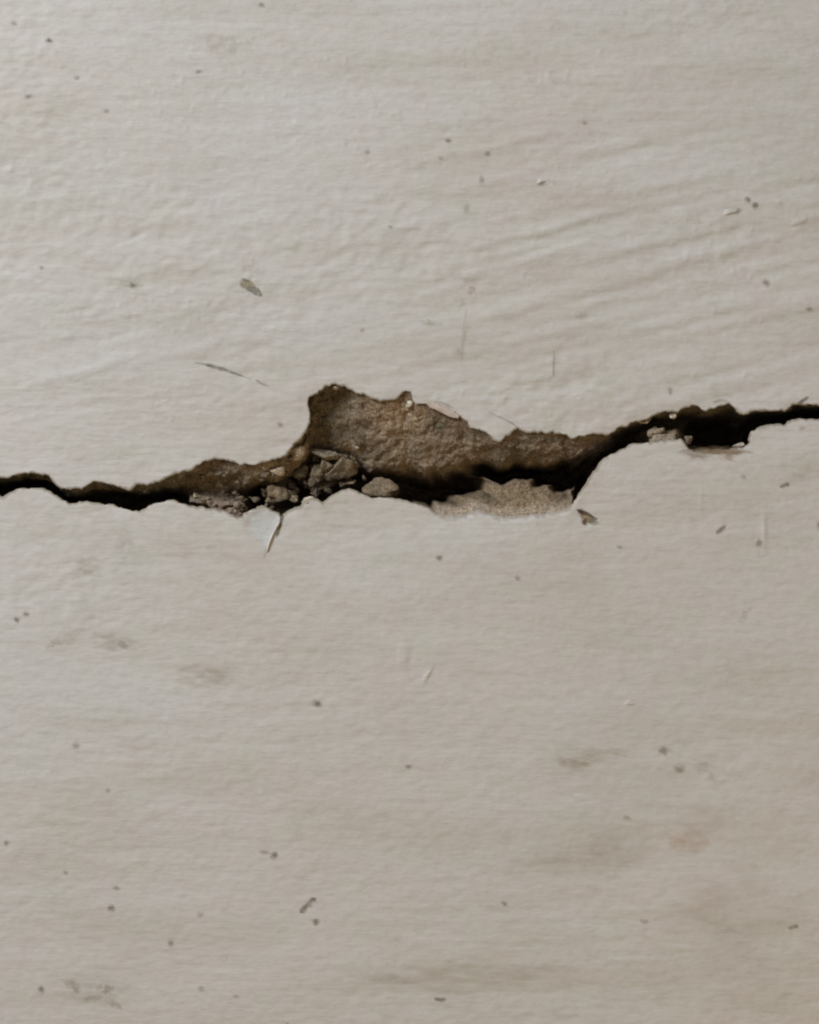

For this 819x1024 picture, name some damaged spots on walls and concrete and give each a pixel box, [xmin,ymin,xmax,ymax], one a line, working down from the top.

flaking render [250,383,610,525]
crack [605,398,819,457]
crack [0,458,282,552]